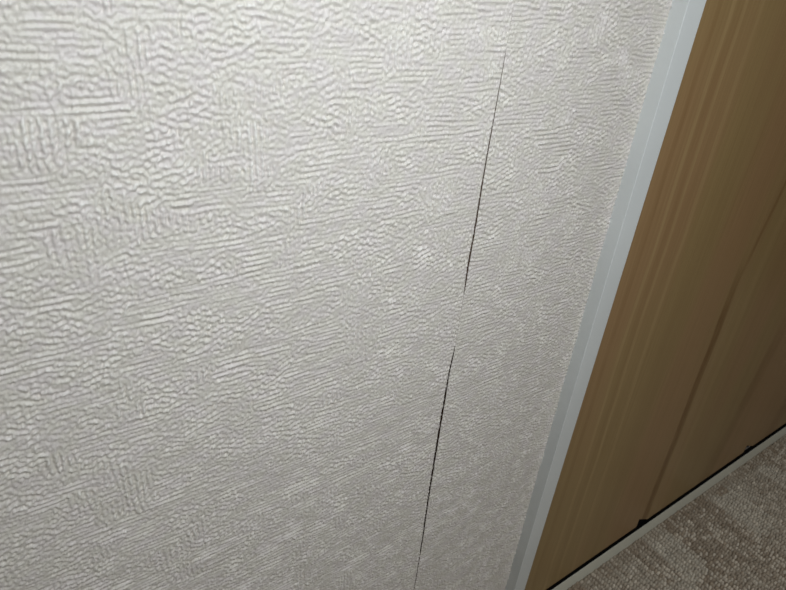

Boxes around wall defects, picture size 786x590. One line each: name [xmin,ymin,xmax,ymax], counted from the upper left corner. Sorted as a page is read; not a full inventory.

crack [414,1,515,588]